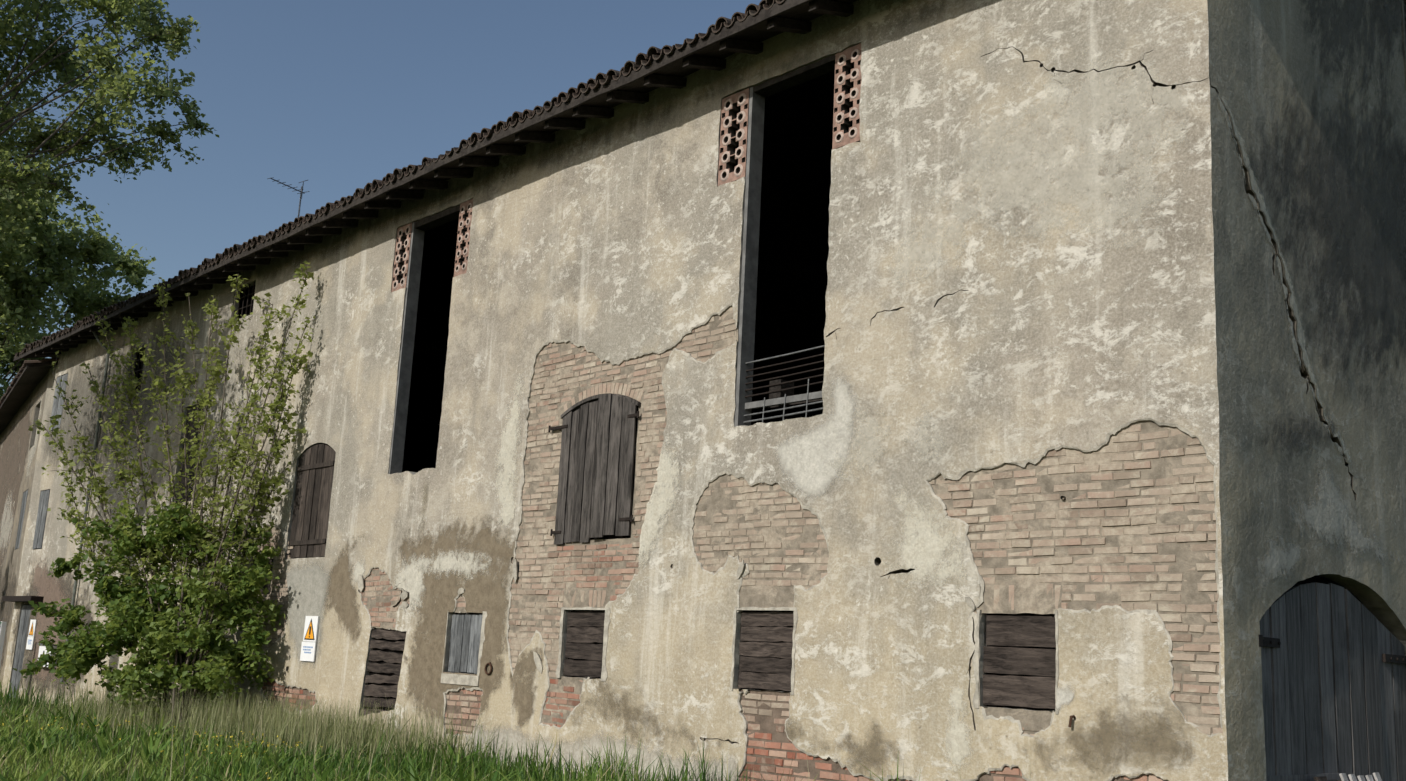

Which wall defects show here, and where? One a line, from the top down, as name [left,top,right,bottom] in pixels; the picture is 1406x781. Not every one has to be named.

leakage [1251,0,1406,371]
crack [981,46,1357,500]
leakage [324,543,365,639]
flaking render [357,567,410,633]
leakage [395,376,542,726]
flaking render [506,302,738,729]
flaking render [690,471,829,612]
flaking render [925,418,1223,737]
flaking render [443,686,483,736]
flaking render [700,689,916,781]
flaking render [946,764,1031,781]
flaking render [1108,773,1169,781]